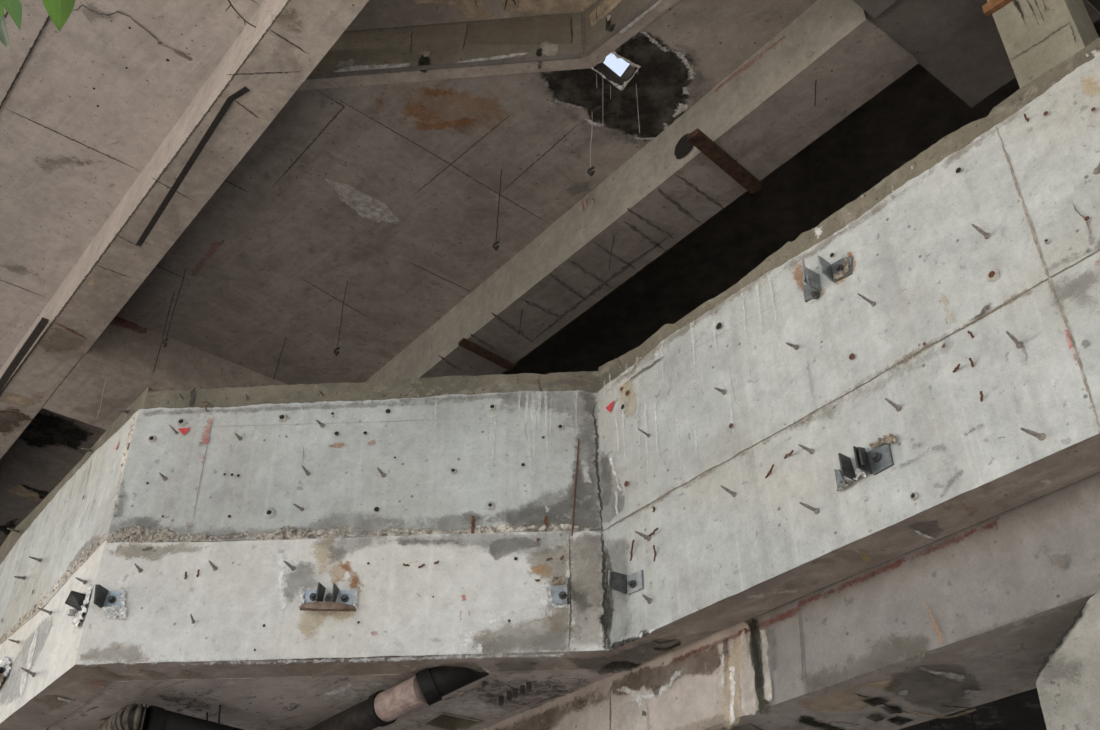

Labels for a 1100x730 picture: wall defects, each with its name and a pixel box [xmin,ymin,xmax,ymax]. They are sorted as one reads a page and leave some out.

crack [72,2,172,49]
rust [687,128,763,194]
peeling [618,671,680,716]